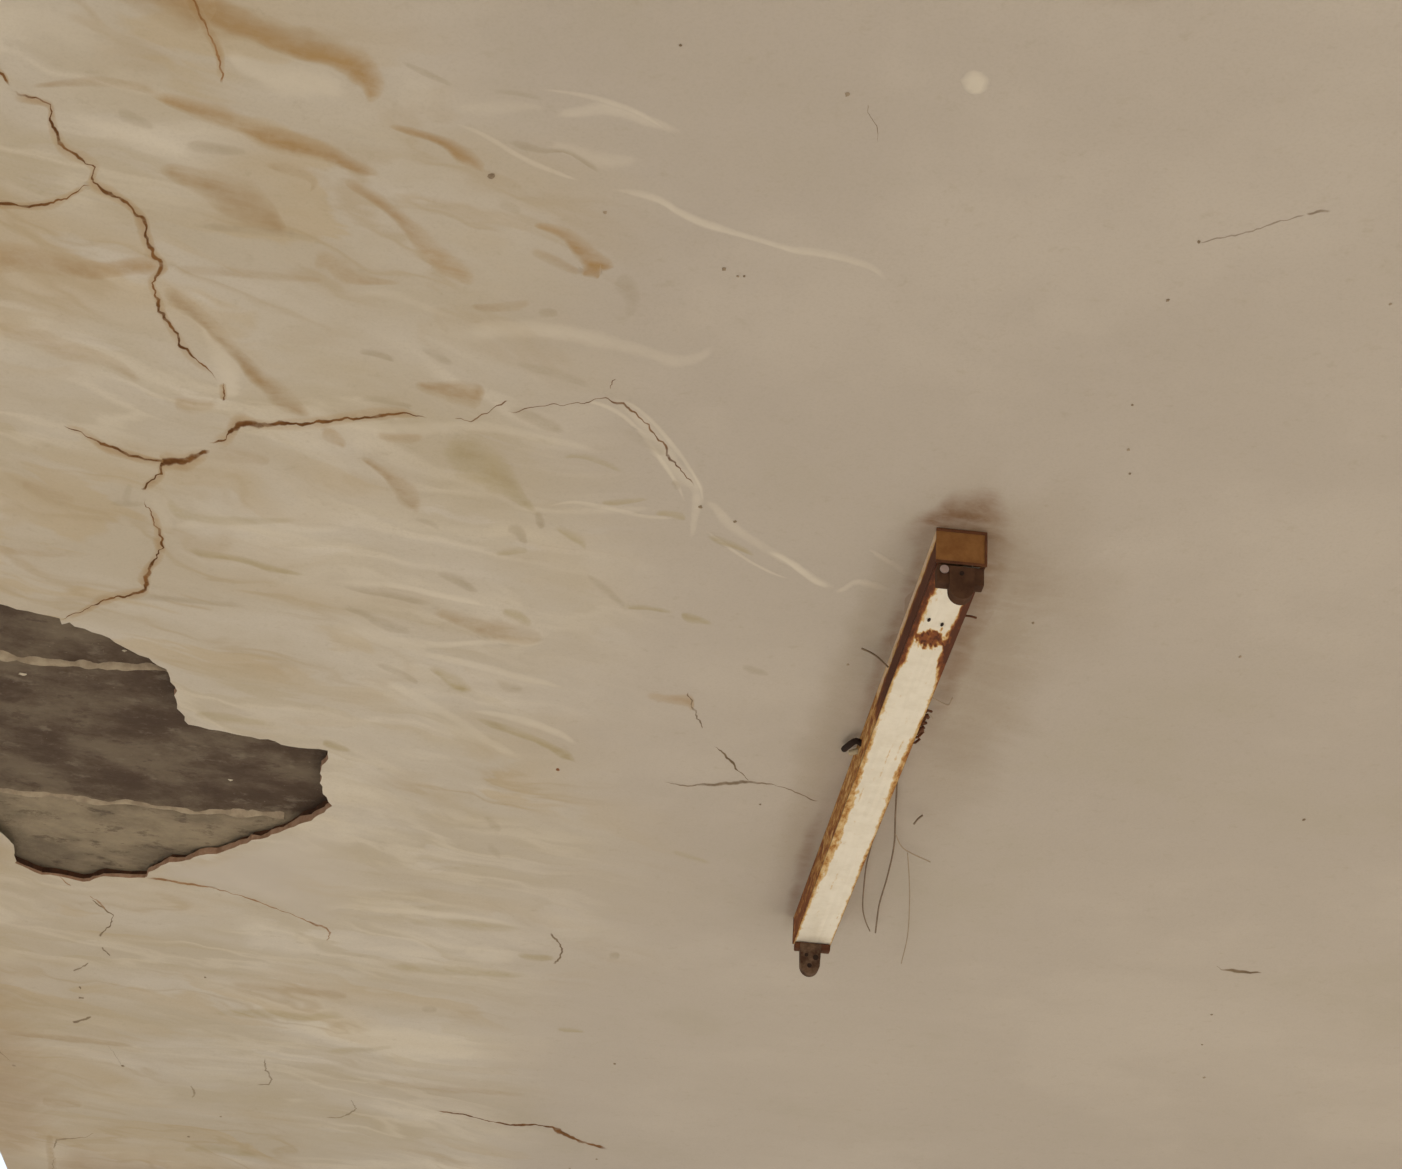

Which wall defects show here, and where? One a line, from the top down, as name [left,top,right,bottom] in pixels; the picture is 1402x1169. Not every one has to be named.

crack [184,0,227,84]
crack [0,66,695,624]
damp [0,0,900,597]
damp [0,832,16,876]
flaking render [0,604,332,882]
crack [145,877,332,942]
damp [108,481,584,766]
damp [360,899,557,980]
crack [664,692,820,802]
rust [761,440,1152,936]
damp [0,941,345,1169]
crack [434,1110,608,1150]